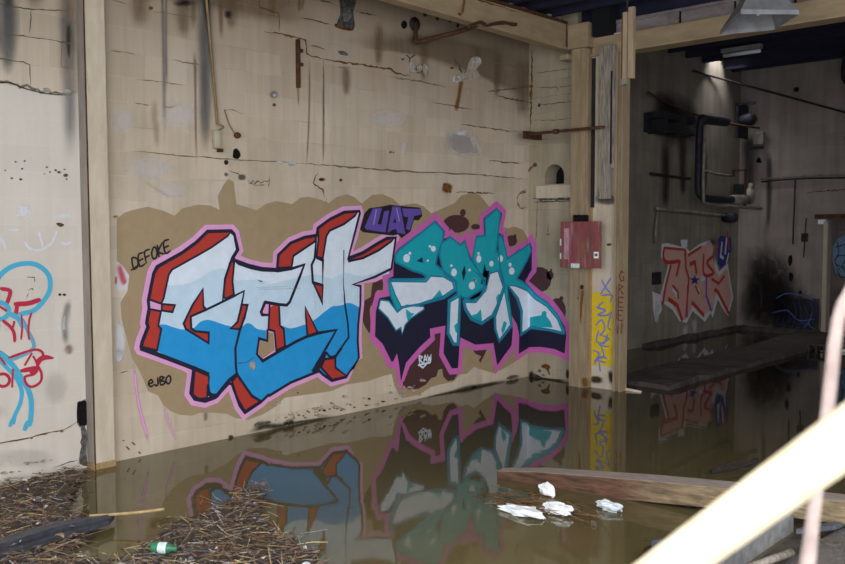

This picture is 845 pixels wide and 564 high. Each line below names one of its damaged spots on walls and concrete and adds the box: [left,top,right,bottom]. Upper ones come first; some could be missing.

leakage [2,0,12,63]
crack [0,3,76,69]
leakage [181,0,285,125]
crack [240,0,571,132]
leakage [377,33,506,88]
crack [0,422,77,444]